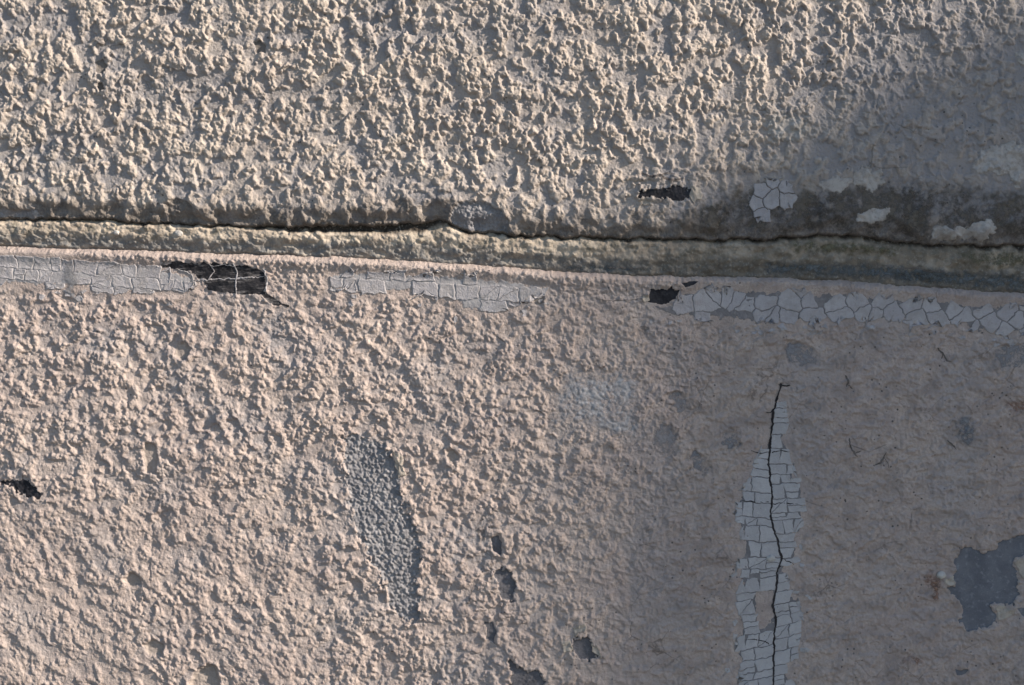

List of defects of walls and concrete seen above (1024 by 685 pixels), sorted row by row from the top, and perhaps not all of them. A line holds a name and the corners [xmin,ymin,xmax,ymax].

peeling [638,185,702,205]
leakage [694,185,1024,235]
flaking render [931,219,997,243]
peeling [0,255,289,307]
peeling [330,265,549,323]
leakage [767,262,1024,290]
peeling [642,280,1024,367]
peeling [0,479,43,499]
peeling [341,433,424,625]
crack [743,383,794,685]
peeling [725,401,812,685]
peeling [944,535,1024,632]